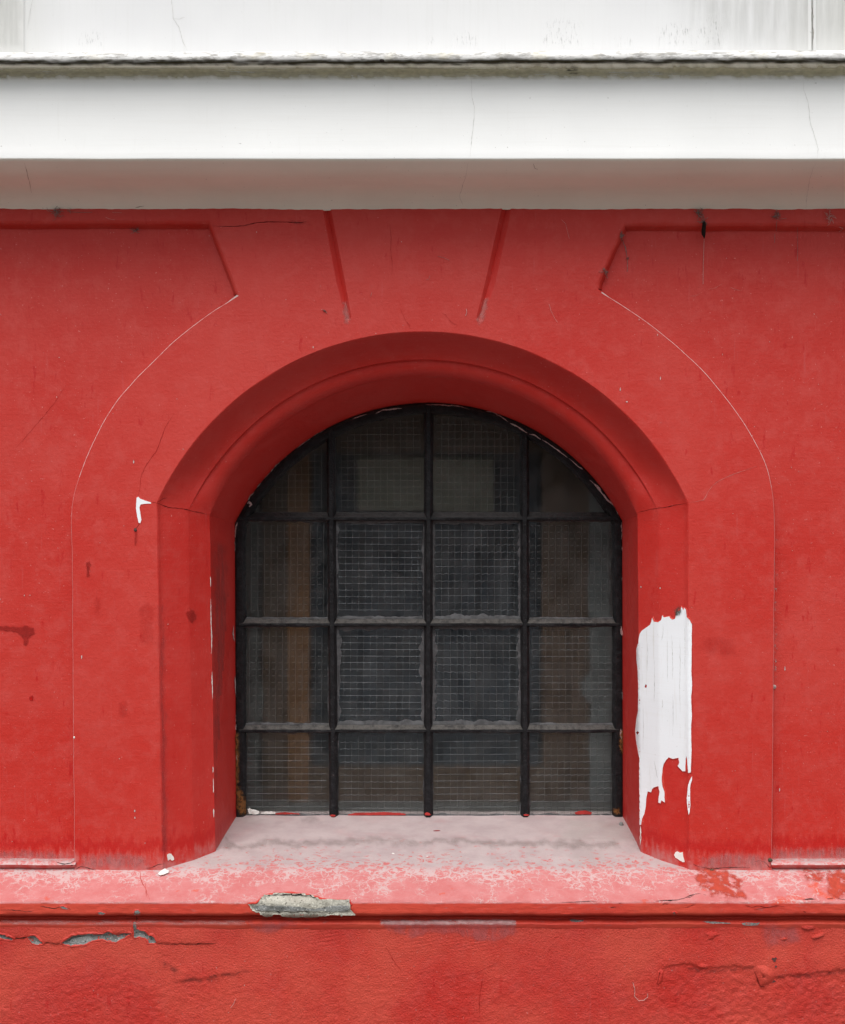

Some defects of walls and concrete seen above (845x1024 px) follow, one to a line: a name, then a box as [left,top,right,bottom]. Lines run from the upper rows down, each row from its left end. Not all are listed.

crack [223,220,303,228]
peeling [620,606,693,843]
peeling [696,868,746,898]
spalling [247,891,355,918]
peeling [0,933,45,946]
peeling [60,909,157,948]